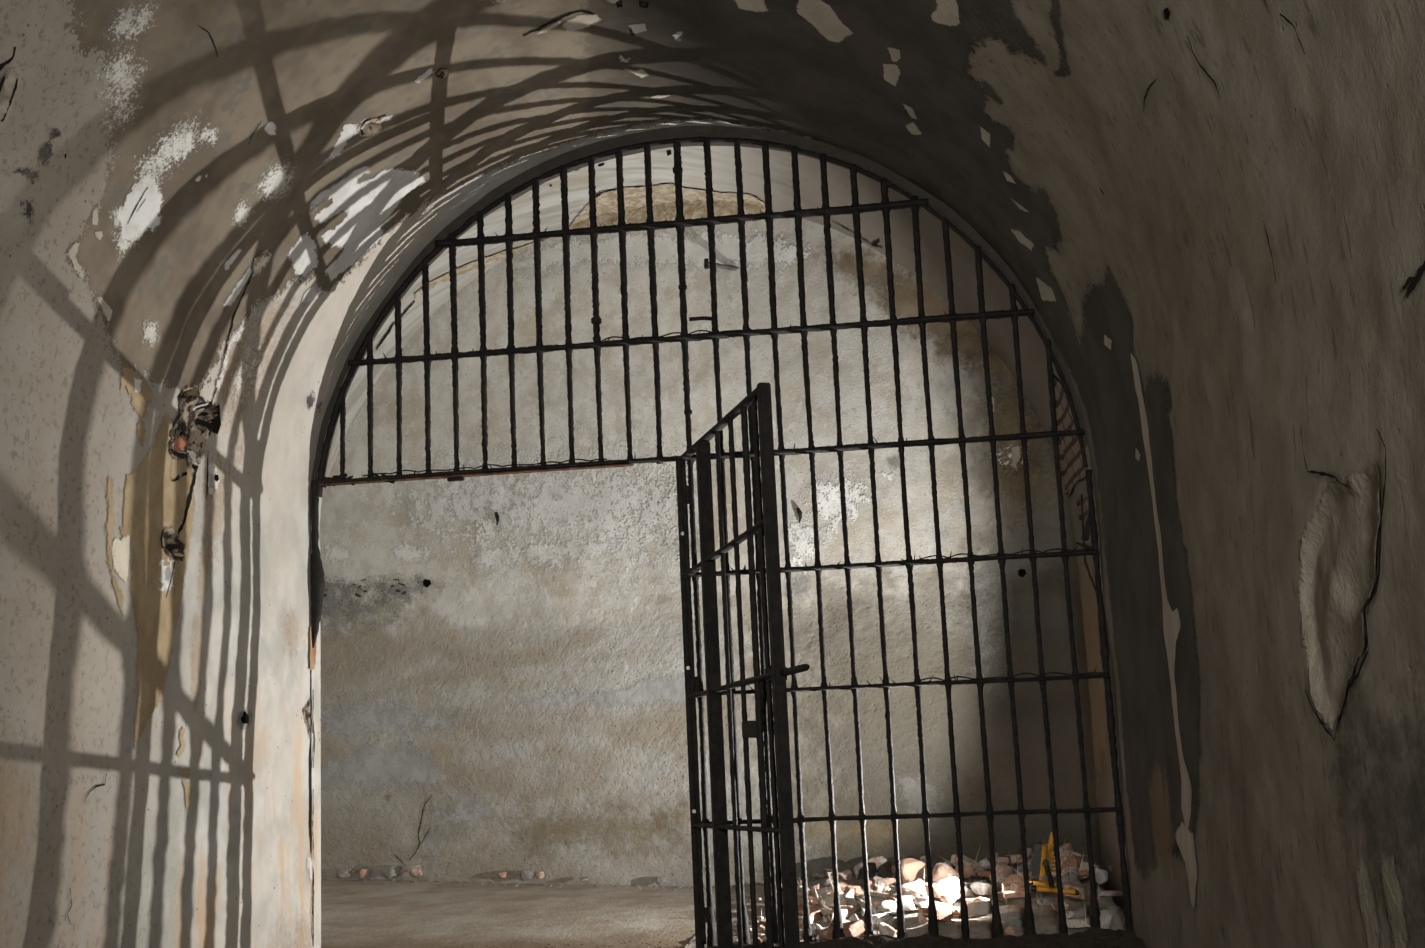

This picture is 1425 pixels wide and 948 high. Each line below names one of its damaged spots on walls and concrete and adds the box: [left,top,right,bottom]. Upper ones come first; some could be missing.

peeling [63,0,1202,882]
spalling [306,856,314,946]